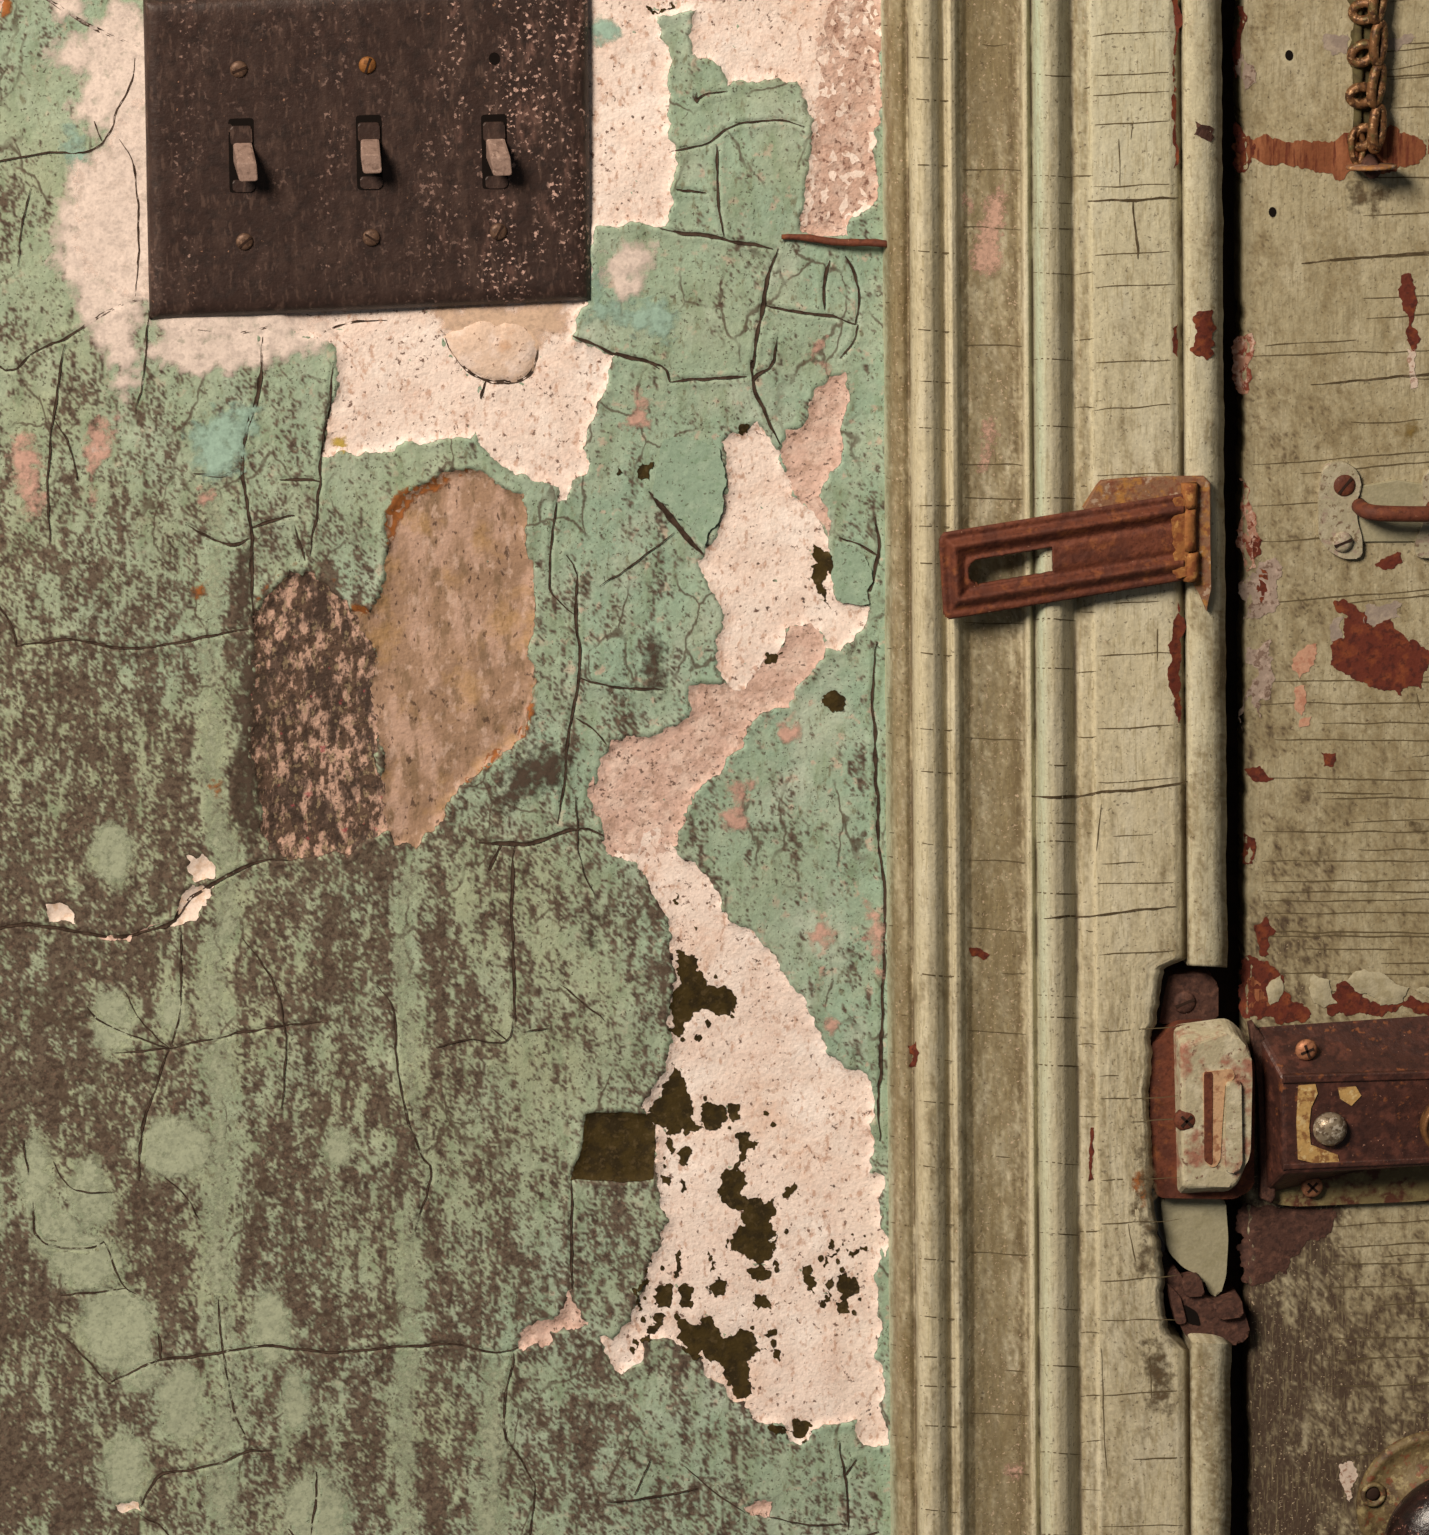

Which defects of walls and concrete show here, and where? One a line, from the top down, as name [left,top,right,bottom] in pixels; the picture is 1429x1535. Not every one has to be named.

crack [0,320,387,649]
peeling [44,0,882,861]
crack [440,330,539,399]
crack [573,72,1179,445]
peeling [1171,0,1183,168]
peeling [1194,121,1214,142]
peeling [1231,121,1429,181]
peeling [518,339,889,1447]
crack [870,601,1188,1282]
crack [1261,676,1429,992]
corrosion [1203,1069,1235,1168]
crack [65,1301,535,1535]